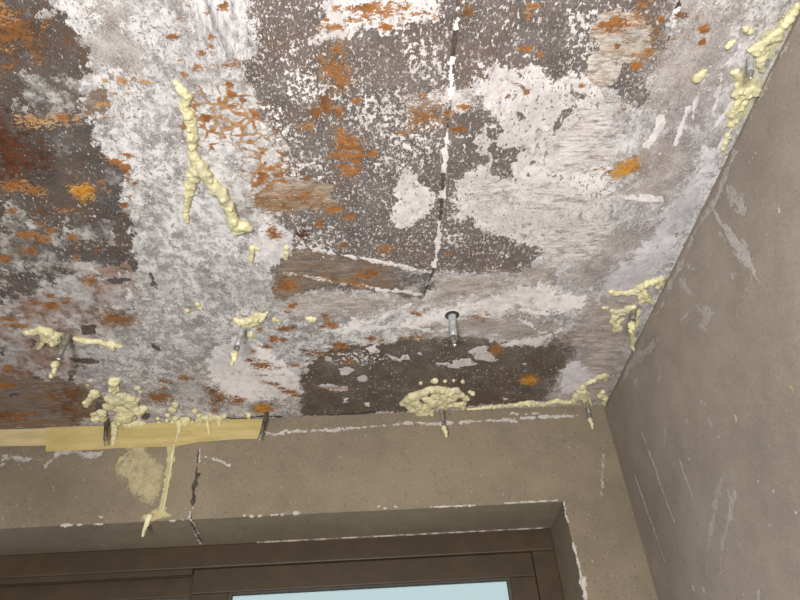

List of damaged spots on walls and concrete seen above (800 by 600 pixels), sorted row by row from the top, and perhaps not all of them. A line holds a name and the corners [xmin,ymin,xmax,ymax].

corrosion [0,0,78,88]
corrosion [174,34,242,77]
corrosion [588,0,712,72]
corrosion [0,72,155,264]
corrosion [189,0,440,243]
crack [424,0,460,294]
spalling [171,0,750,417]
corrosion [593,153,649,184]
corrosion [0,315,29,330]
corrosion [23,292,74,324]
water stain [485,412,579,423]
crack [187,449,202,544]